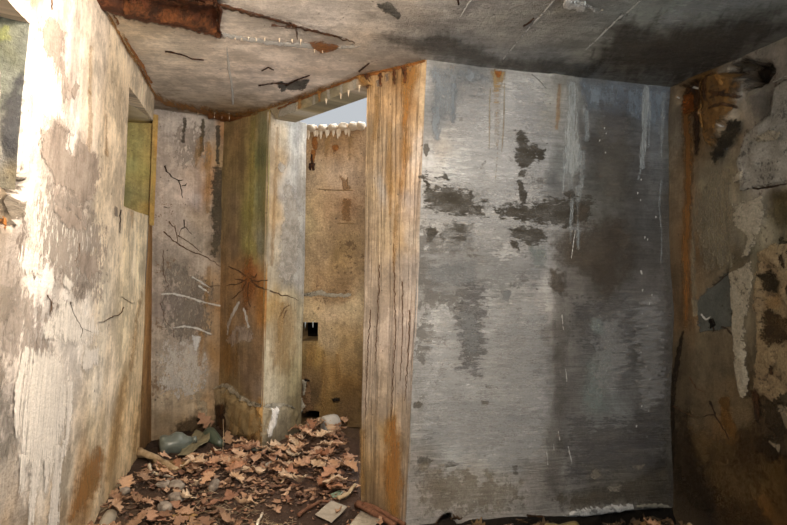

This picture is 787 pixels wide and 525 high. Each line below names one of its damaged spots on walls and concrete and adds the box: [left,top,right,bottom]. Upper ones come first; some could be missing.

water stain [0,76,26,159]
efflorescence [14,346,76,525]
water stain [210,125,222,258]
crack [160,165,299,351]
corrosion [97,0,425,131]
corrosion [310,136,318,168]
corrosion [383,416,404,515]
corrosion [489,71,505,187]
water stain [390,0,780,295]
water stain [552,196,674,517]
corrosion [682,72,753,326]
spalling [696,196,787,425]